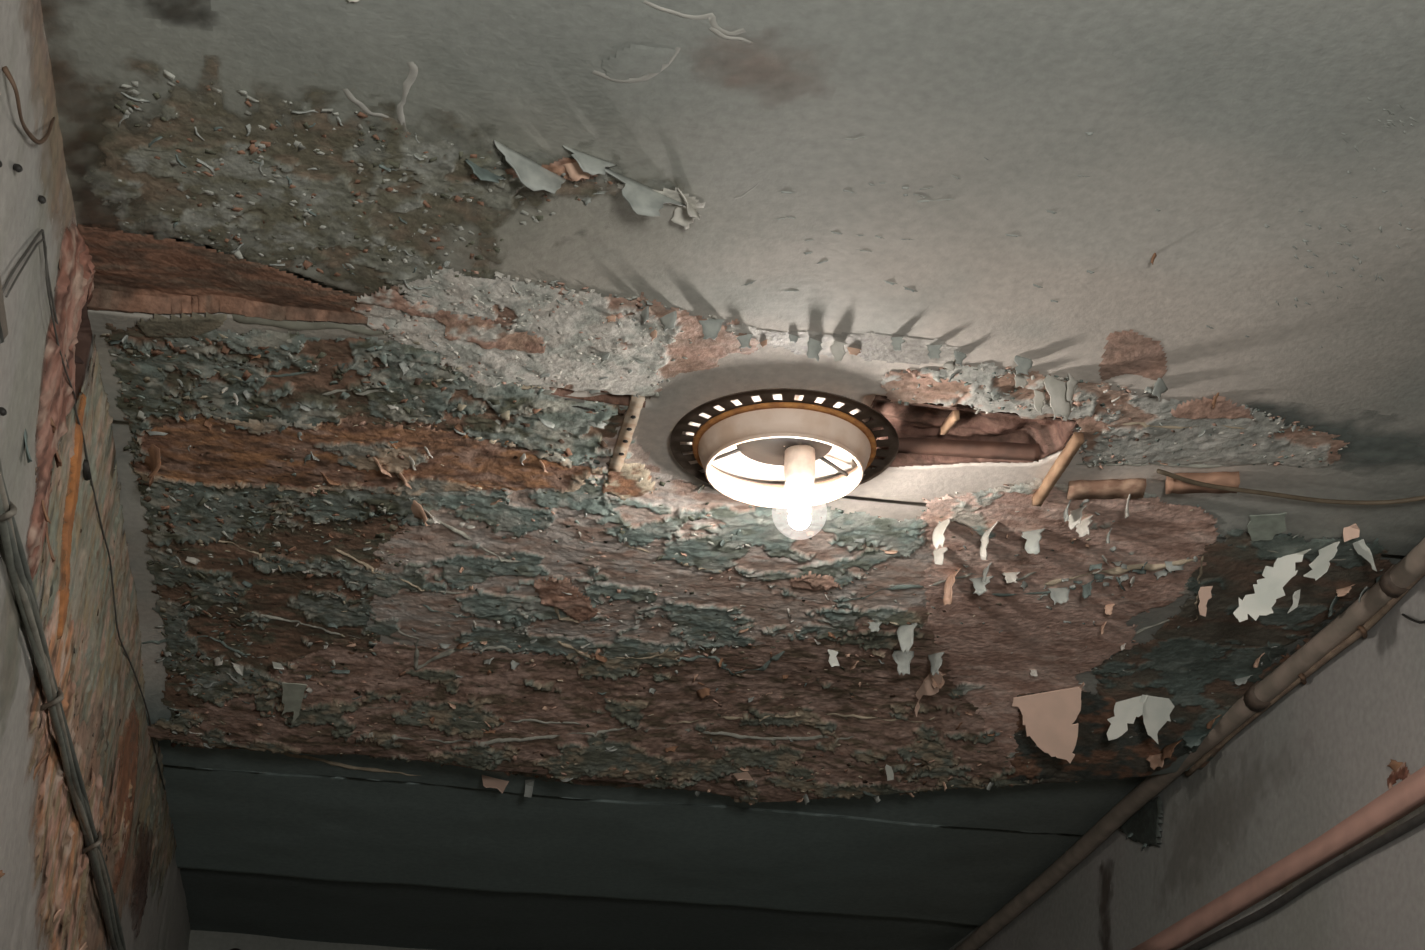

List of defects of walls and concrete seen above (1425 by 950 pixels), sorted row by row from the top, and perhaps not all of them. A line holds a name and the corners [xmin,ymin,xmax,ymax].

crack [643,0,753,45]
peeling [83,58,701,354]
spalling [24,223,1394,907]
peeling [29,676,94,950]